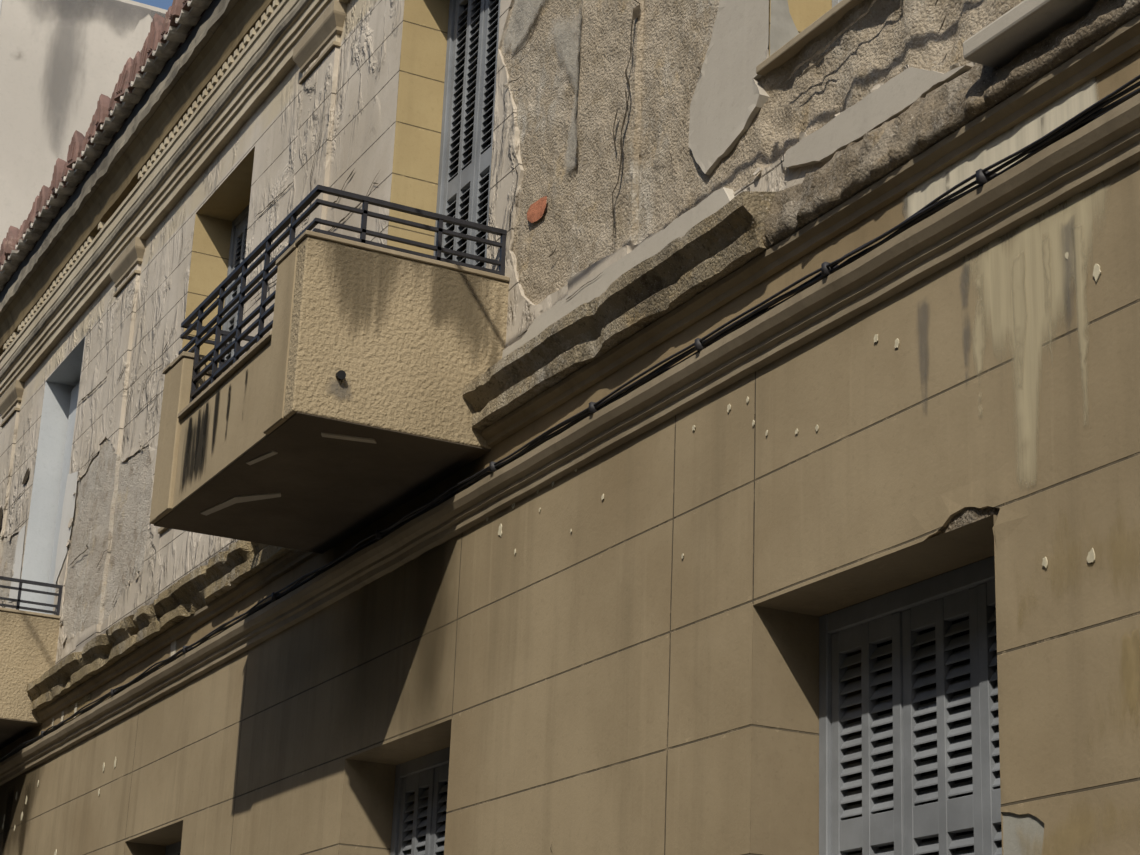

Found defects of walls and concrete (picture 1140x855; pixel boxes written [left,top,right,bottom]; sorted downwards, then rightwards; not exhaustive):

damp [45,0,166,21]
spalling [500,0,1140,305]
damp [965,181,1105,483]
damp [182,385,231,488]
damp [0,766,37,855]
peeling [1003,812,1044,855]